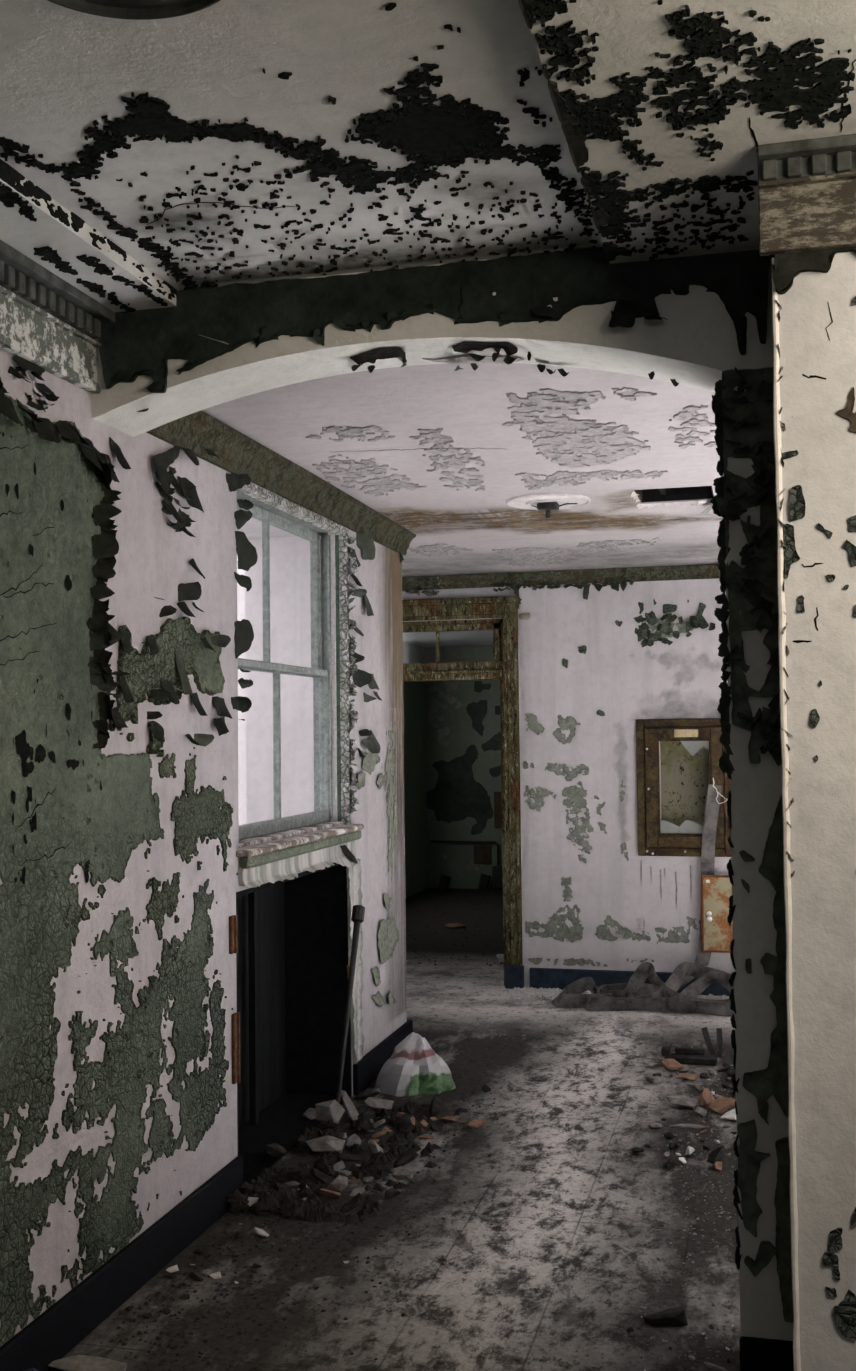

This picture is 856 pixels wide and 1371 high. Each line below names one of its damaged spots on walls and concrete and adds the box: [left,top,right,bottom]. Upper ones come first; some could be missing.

peeling [0,0,856,393]
peeling [502,371,668,490]
peeling [836,387,856,433]
crack [0,510,54,598]
peeling [817,515,856,567]
crack [0,623,56,666]
crack [18,788,56,828]
crack [18,842,71,866]
peeling [0,342,407,1347]
peeling [523,761,626,863]
peeling [615,344,806,1323]
peeling [822,1207,856,1341]